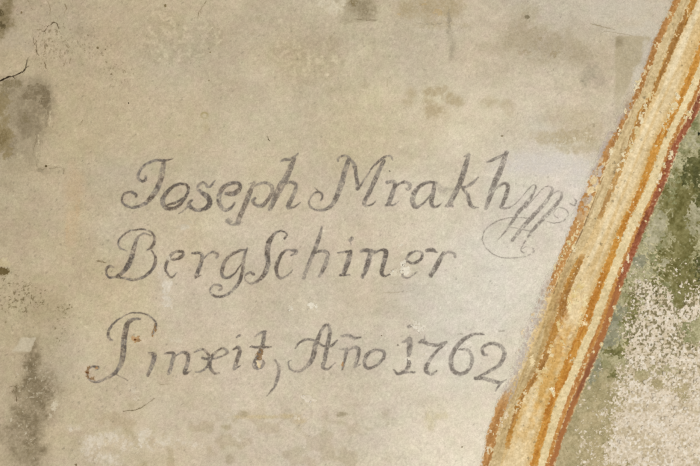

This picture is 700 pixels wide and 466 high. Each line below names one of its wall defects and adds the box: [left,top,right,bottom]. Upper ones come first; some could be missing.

crack [0,0,72,82]
leakage [0,15,140,198]
peeling [565,281,588,330]
flaking render [574,252,700,466]